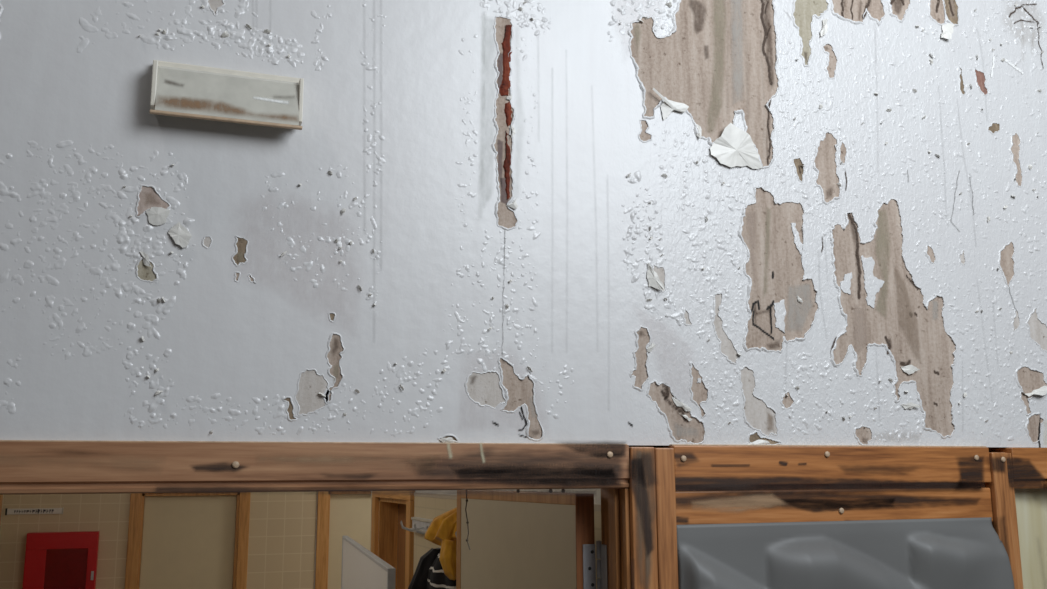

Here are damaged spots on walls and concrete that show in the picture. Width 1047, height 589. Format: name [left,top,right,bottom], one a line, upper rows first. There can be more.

peeling [627,0,780,169]
peeling [791,0,911,79]
peeling [928,0,959,39]
peeling [958,66,988,96]
peeling [792,131,847,205]
peeling [647,262,666,293]
peeling [712,185,820,445]
peeling [829,198,957,439]
peeling [281,312,346,422]
peeling [464,356,545,442]
peeling [629,326,709,444]
peeling [853,425,873,445]